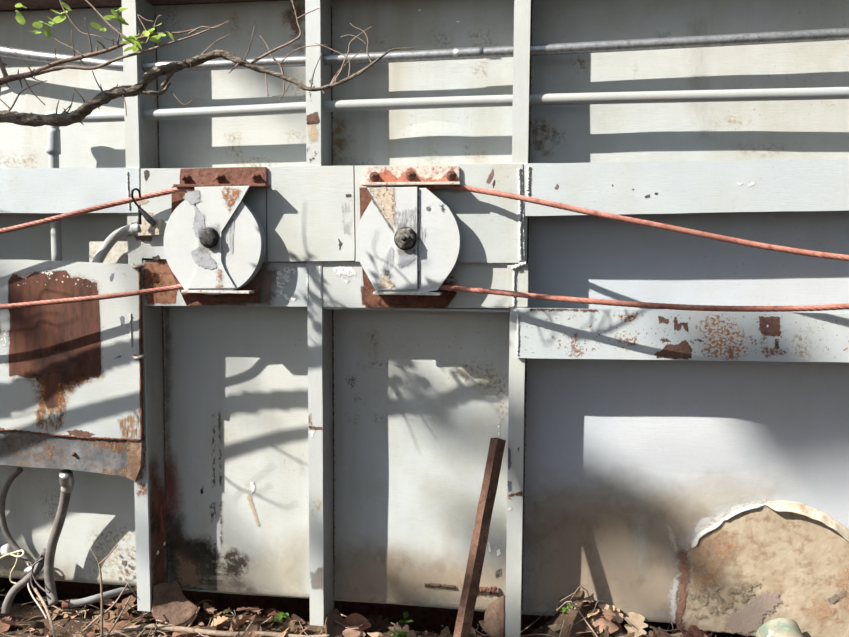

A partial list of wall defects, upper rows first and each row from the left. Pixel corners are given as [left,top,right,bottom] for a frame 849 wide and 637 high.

peeling [183,190,217,270]
corrosion [369,168,457,226]
corrosion [142,259,177,316]
corrosion [530,308,599,328]
corrosion [613,313,786,360]
corrosion [8,270,177,601]
water stain [200,414,222,494]
water stain [166,501,299,593]
peeling [667,498,849,637]